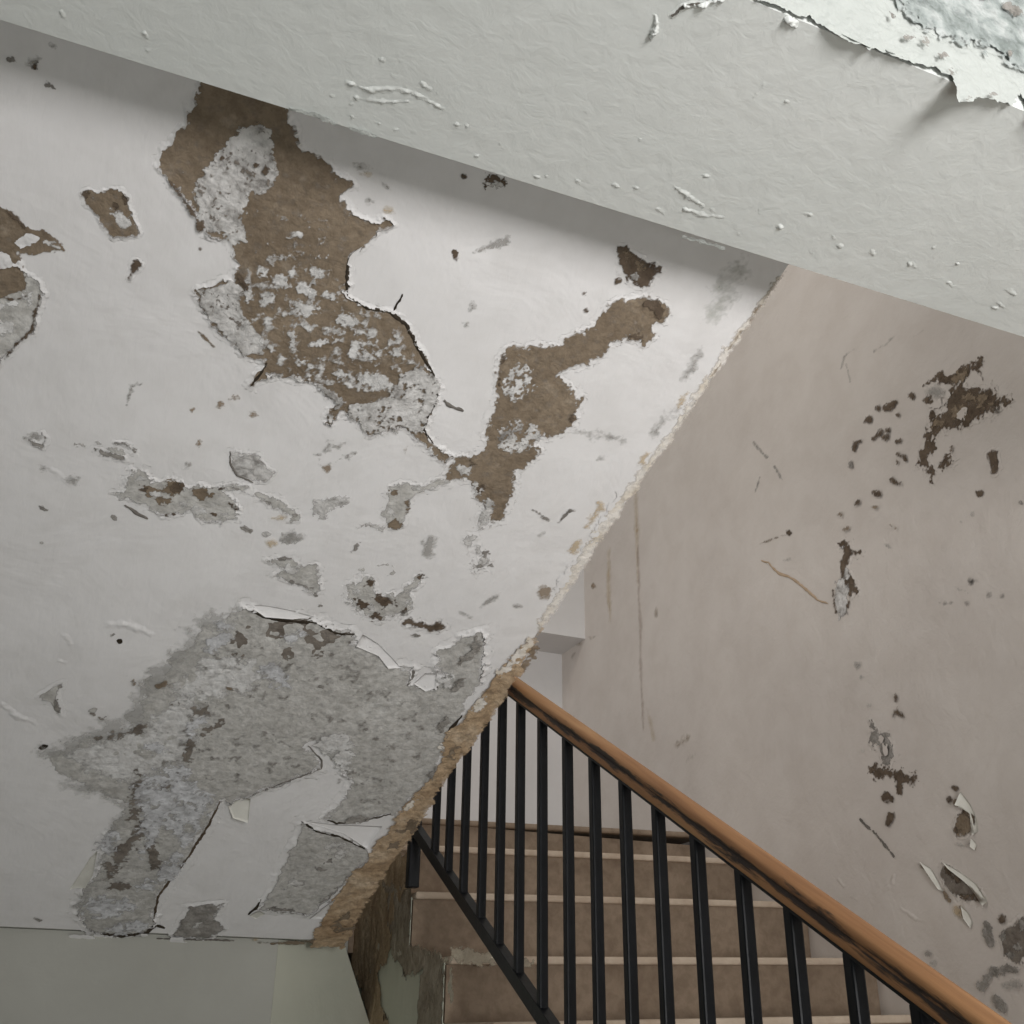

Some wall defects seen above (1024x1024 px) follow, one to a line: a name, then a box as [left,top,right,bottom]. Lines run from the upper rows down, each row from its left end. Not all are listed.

peeling [761,0,1024,106]
peeling [77,185,144,242]
peeling [0,207,65,369]
peeling [151,81,674,579]
peeling [20,429,51,451]
peeling [848,356,1015,489]
peeling [832,512,866,621]
spalling [33,436,544,1024]
peeling [866,715,917,826]
peeling [946,785,978,850]
peeling [920,859,1024,1013]